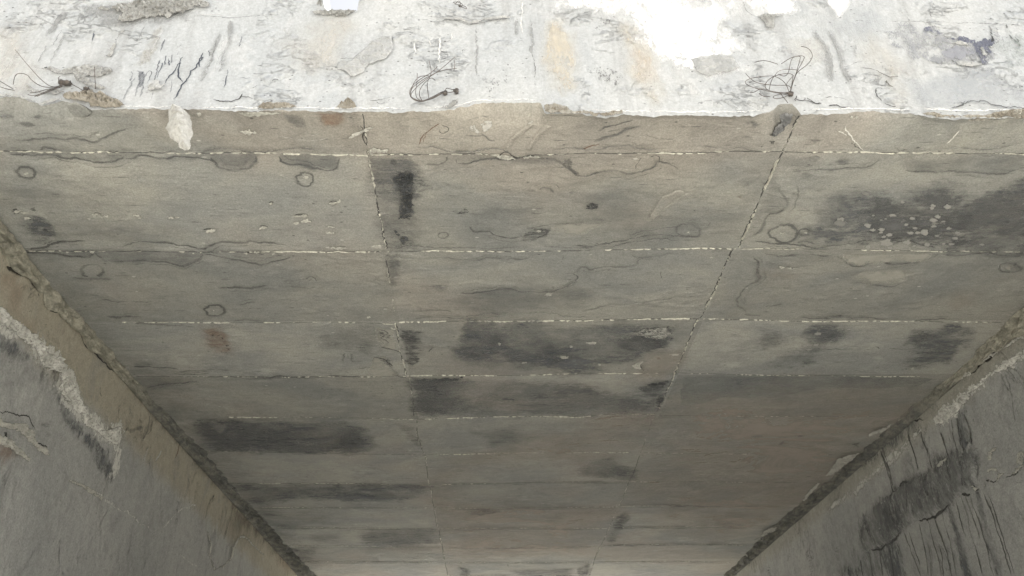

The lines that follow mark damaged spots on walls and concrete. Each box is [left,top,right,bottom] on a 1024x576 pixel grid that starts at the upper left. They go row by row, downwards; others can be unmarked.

crack [165,53,203,97]
crack [795,96,846,108]
crack [844,61,898,107]
crack [952,100,1022,108]
crack [567,120,672,174]
damp [371,159,423,268]
damp [756,168,1024,287]
damp [873,318,973,364]
damp [400,312,673,419]
spalling [0,411,50,461]
damp [199,419,370,454]